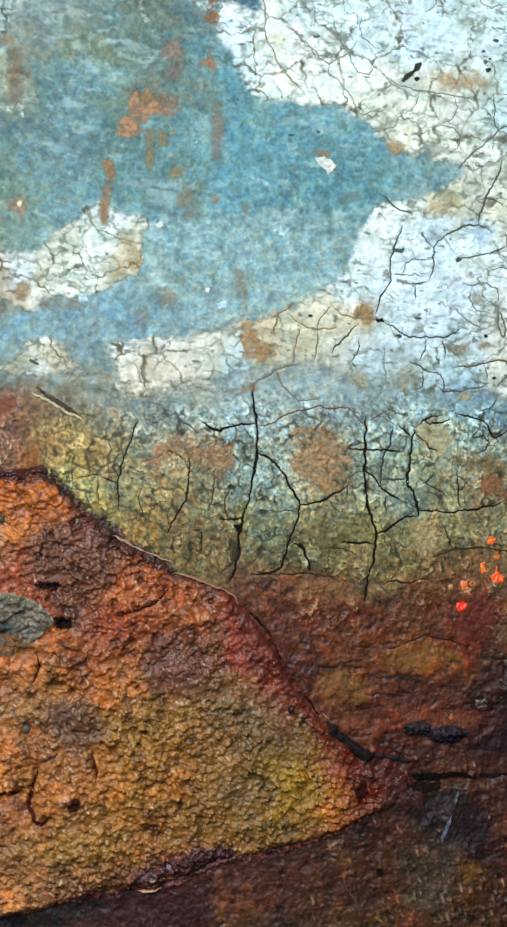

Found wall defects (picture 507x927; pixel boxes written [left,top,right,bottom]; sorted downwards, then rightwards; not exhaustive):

crack [263,0,383,115]
corrosion [146,132,175,168]
corrosion [99,160,114,224]
peeling [16,281,29,299]
crack [71,82,507,601]